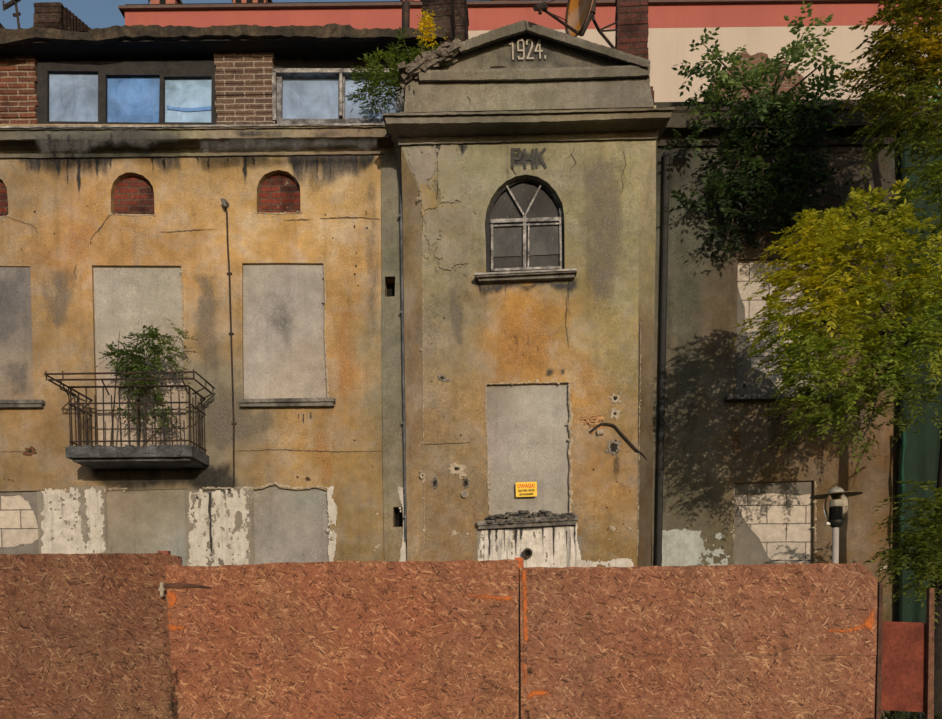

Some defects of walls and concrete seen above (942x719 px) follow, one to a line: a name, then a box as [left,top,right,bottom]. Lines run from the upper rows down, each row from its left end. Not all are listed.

leakage [20,158,112,190]
leakage [151,157,179,170]
leakage [196,156,266,178]
peeling [448,322,642,568]
peeling [0,478,127,555]
peeling [184,476,338,566]
peeling [662,481,817,566]